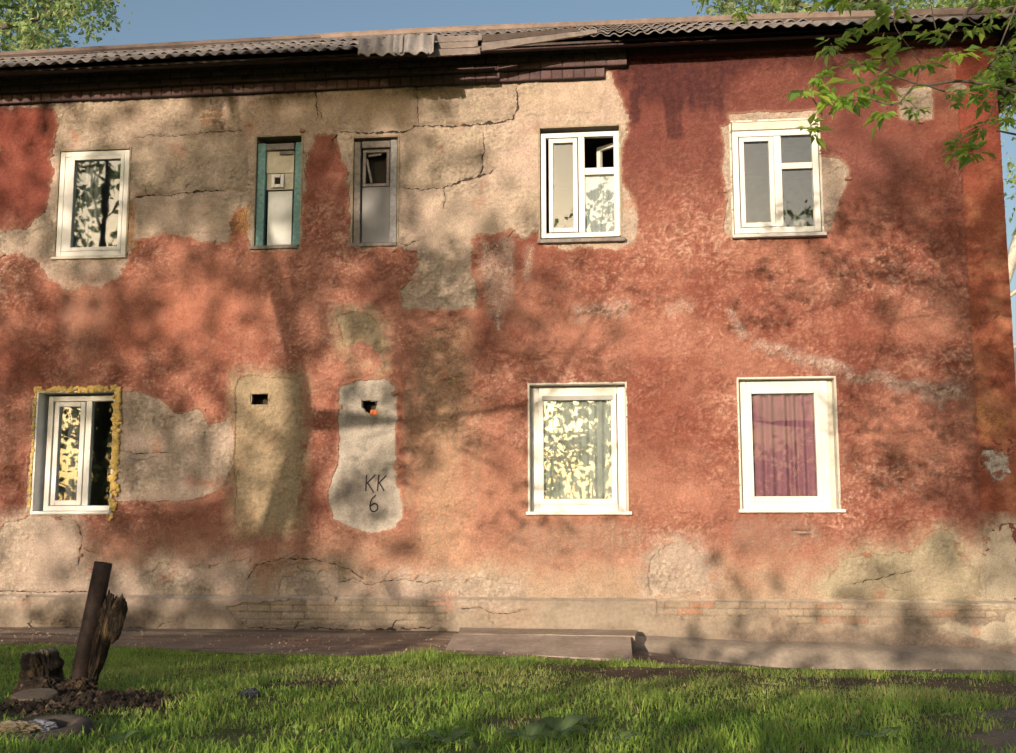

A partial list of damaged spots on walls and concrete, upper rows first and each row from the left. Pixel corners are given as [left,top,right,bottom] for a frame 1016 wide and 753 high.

spalling [0,70,638,311]
crack [315,88,519,207]
damp [618,43,757,137]
spalling [0,398,93,600]
spalling [113,387,234,502]
flaking render [107,558,522,630]
spalling [648,524,1016,646]